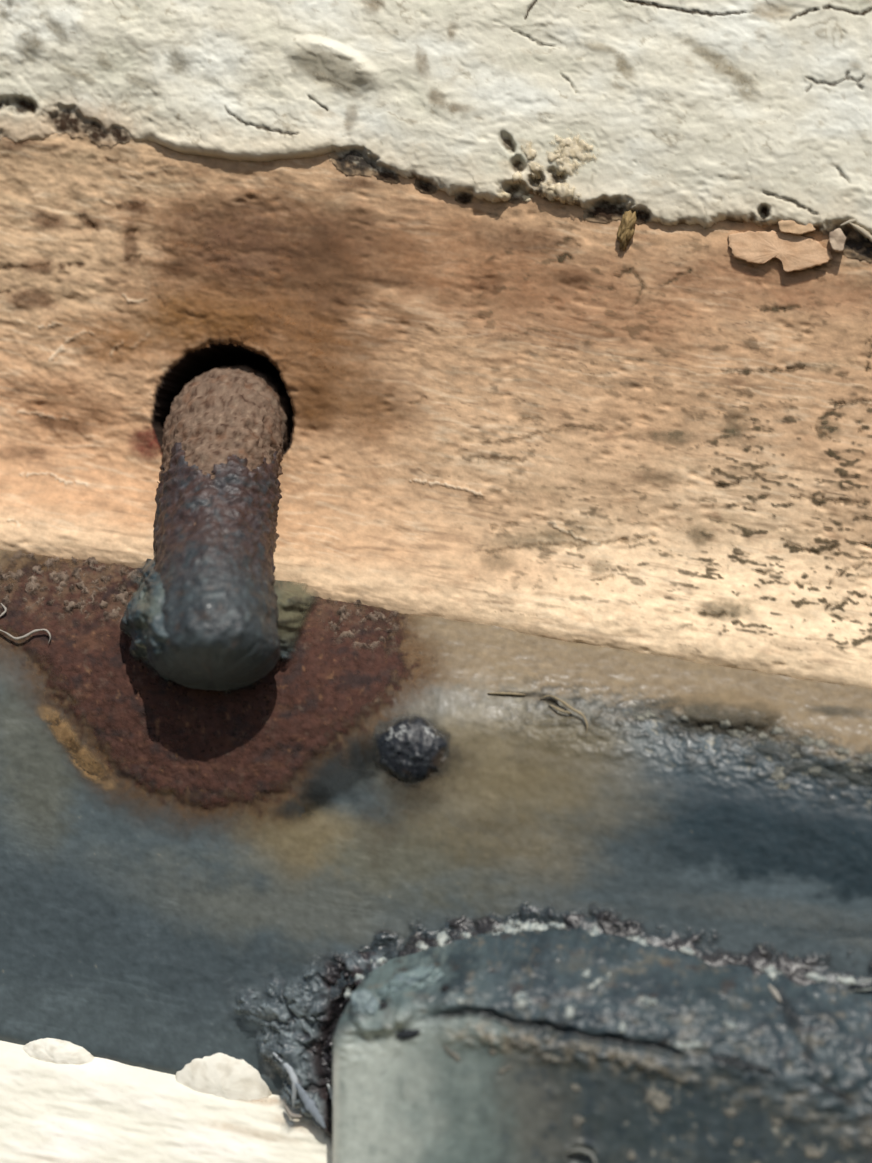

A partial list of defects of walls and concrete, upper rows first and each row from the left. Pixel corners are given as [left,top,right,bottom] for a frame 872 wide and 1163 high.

crack [625,0,746,16]
crack [791,6,872,20]
spalling [0,99,36,113]
spalling [51,110,128,142]
flaking render [497,135,596,205]
spalling [590,200,650,223]
peeling [728,207,872,273]
rust [162,205,385,433]
rust [136,431,161,456]
rust [0,553,433,818]
leakage [44,708,110,785]
peeling [272,1052,326,1128]